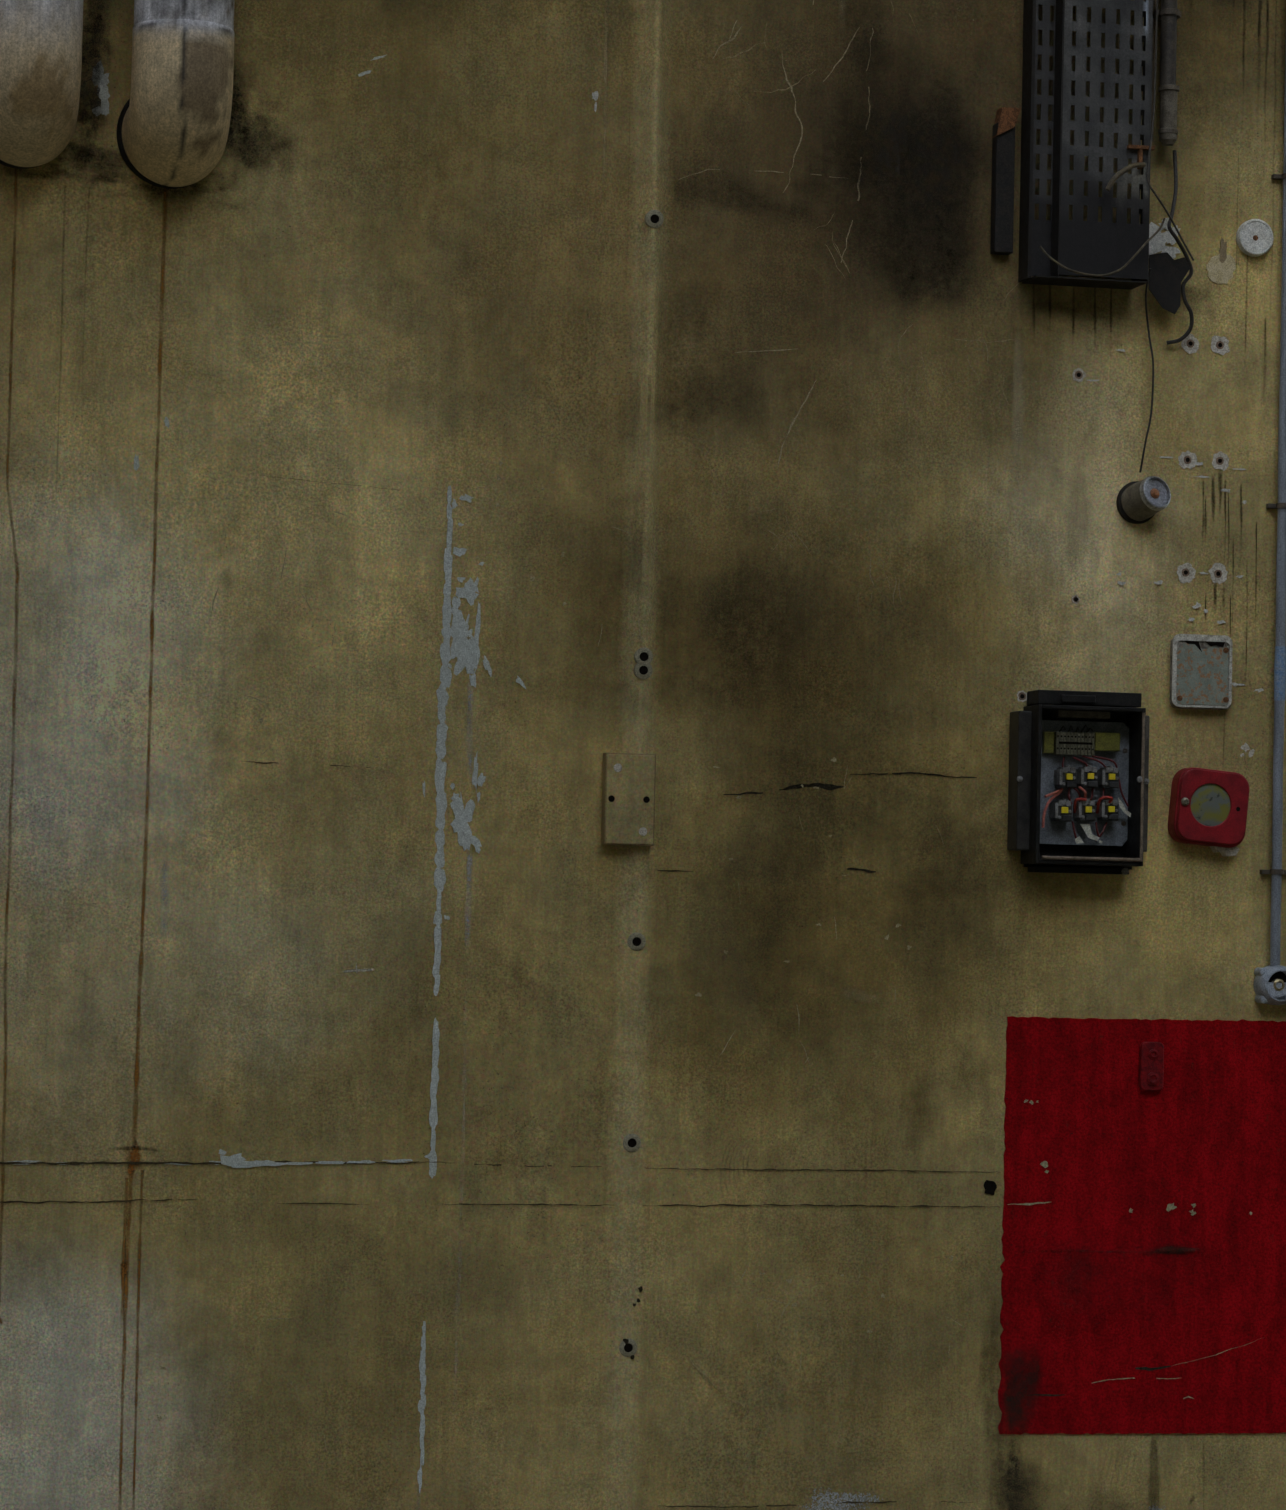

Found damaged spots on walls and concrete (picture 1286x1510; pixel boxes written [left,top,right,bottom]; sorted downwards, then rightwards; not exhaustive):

crack [713,2,919,278]
rust [10,511,19,648]
peeling [422,486,492,996]
rust [117,339,162,1505]
peeling [209,1017,440,1178]
spalling [984,1180,1049,1205]